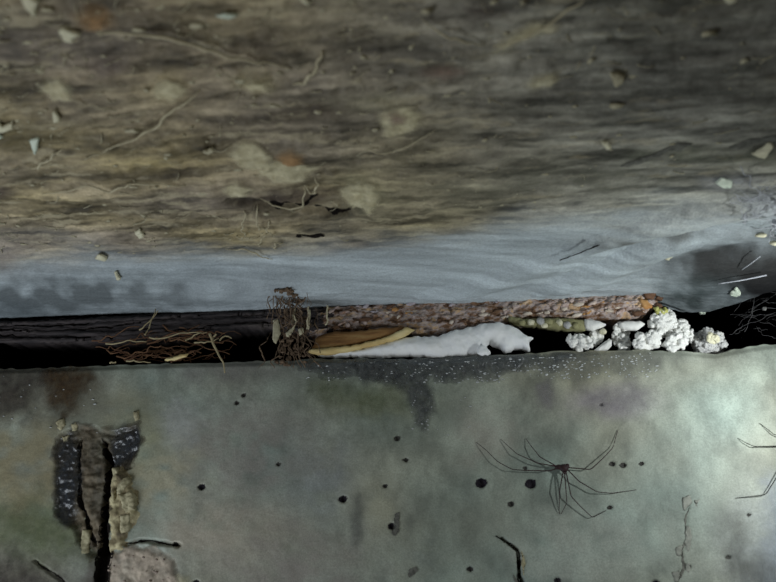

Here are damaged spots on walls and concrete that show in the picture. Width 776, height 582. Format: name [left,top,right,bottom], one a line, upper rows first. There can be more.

leakage [303,352,658,430]
crack [37,561,65,582]
spalling [53,410,199,582]
crack [77,438,179,582]
crack [496,536,526,582]
crack [672,495,699,582]